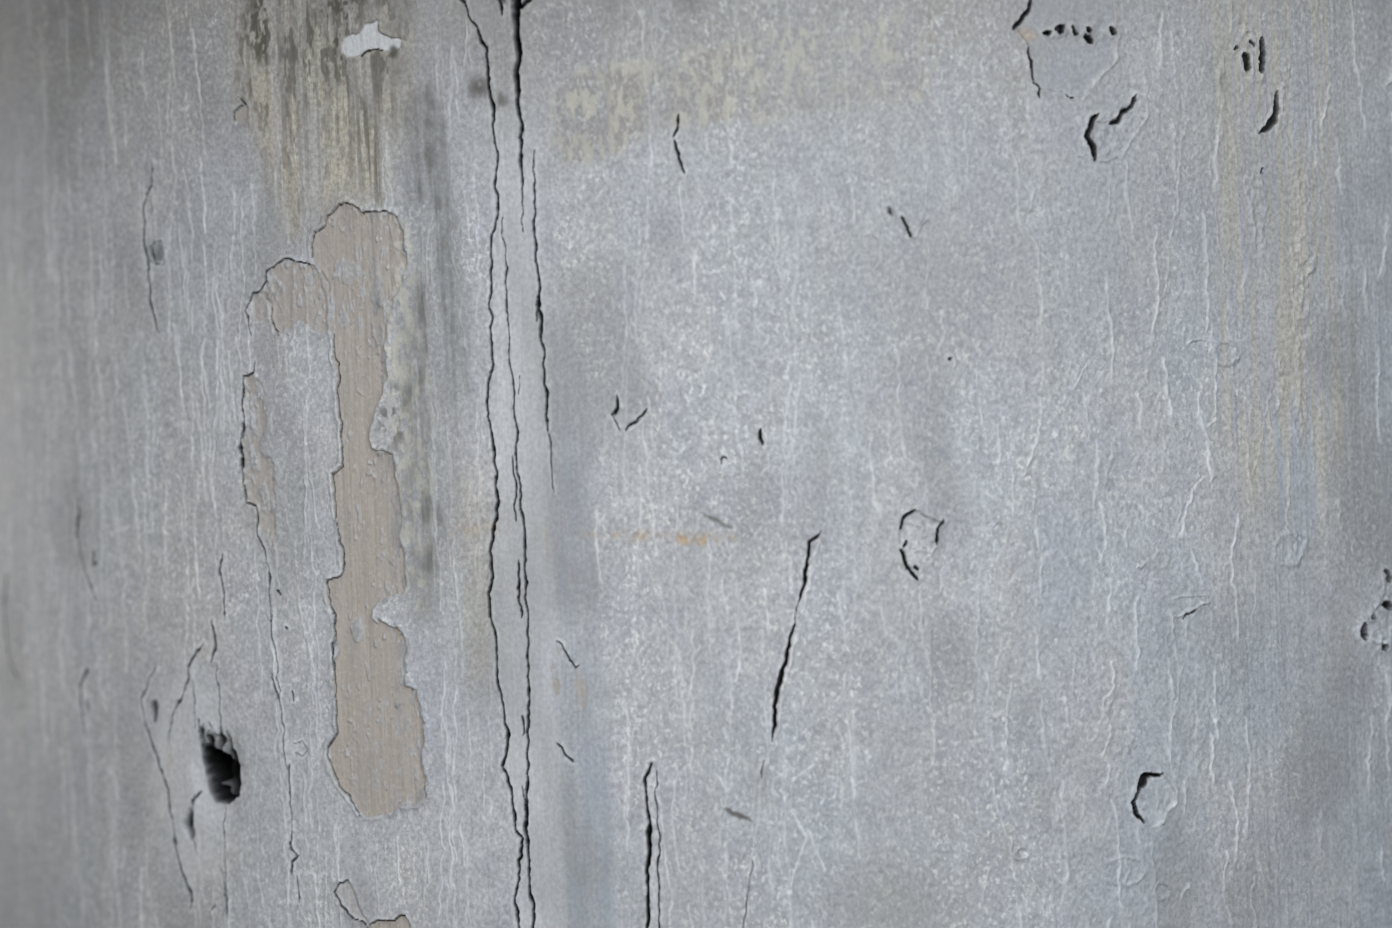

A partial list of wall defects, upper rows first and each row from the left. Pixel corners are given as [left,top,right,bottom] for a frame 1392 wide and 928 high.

peeling [338,15,405,60]
peeling [1011,0,1151,163]
crack [141,161,160,334]
peeling [238,199,428,820]
crack [459,0,575,928]
spalling [1359,567,1392,652]
peeling [332,878,413,928]
crack [642,760,662,928]
crack [742,522,827,928]
peeling [1130,769,1181,828]